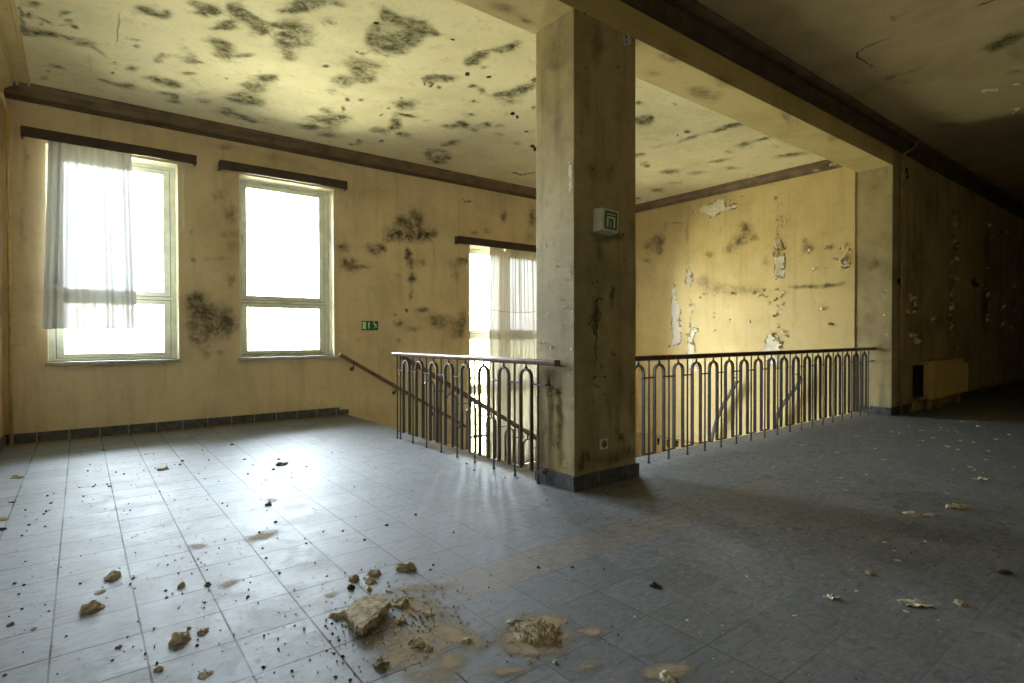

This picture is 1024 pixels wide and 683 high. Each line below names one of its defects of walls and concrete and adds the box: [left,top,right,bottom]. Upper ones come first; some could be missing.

damp [18,2,89,44]
damp [138,7,169,18]
damp [193,0,337,60]
damp [338,10,455,84]
damp [150,58,202,103]
damp [221,75,276,122]
damp [303,98,363,137]
damp [370,97,416,141]
peeling [693,194,744,218]
damp [370,213,437,283]
peeling [753,196,789,366]
peeling [667,266,715,372]